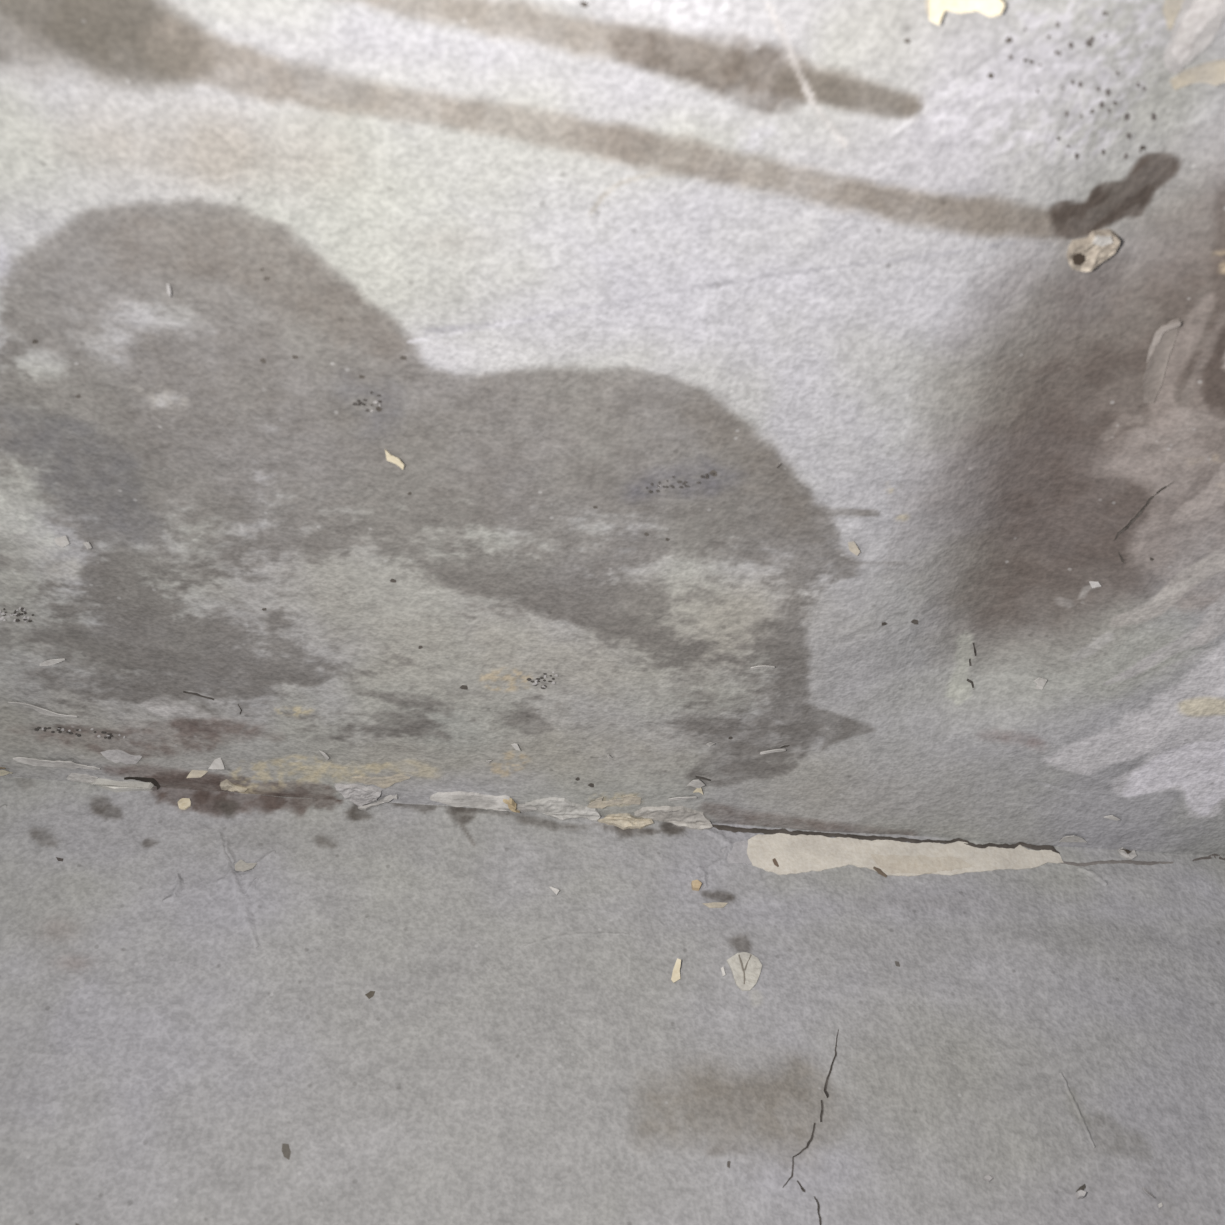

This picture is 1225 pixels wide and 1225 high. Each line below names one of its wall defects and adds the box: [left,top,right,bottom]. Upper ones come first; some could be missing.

peeling [925,0,1006,25]
spalling [1047,22,1107,56]
peeling [1163,0,1225,90]
leakage [0,0,1225,823]
peeling [100,750,142,764]
peeling [187,757,225,778]
peeling [178,798,191,810]
peeling [687,780,705,795]
peeling [721,833,1064,877]
crack [712,824,1225,867]
crack [782,1029,839,1225]